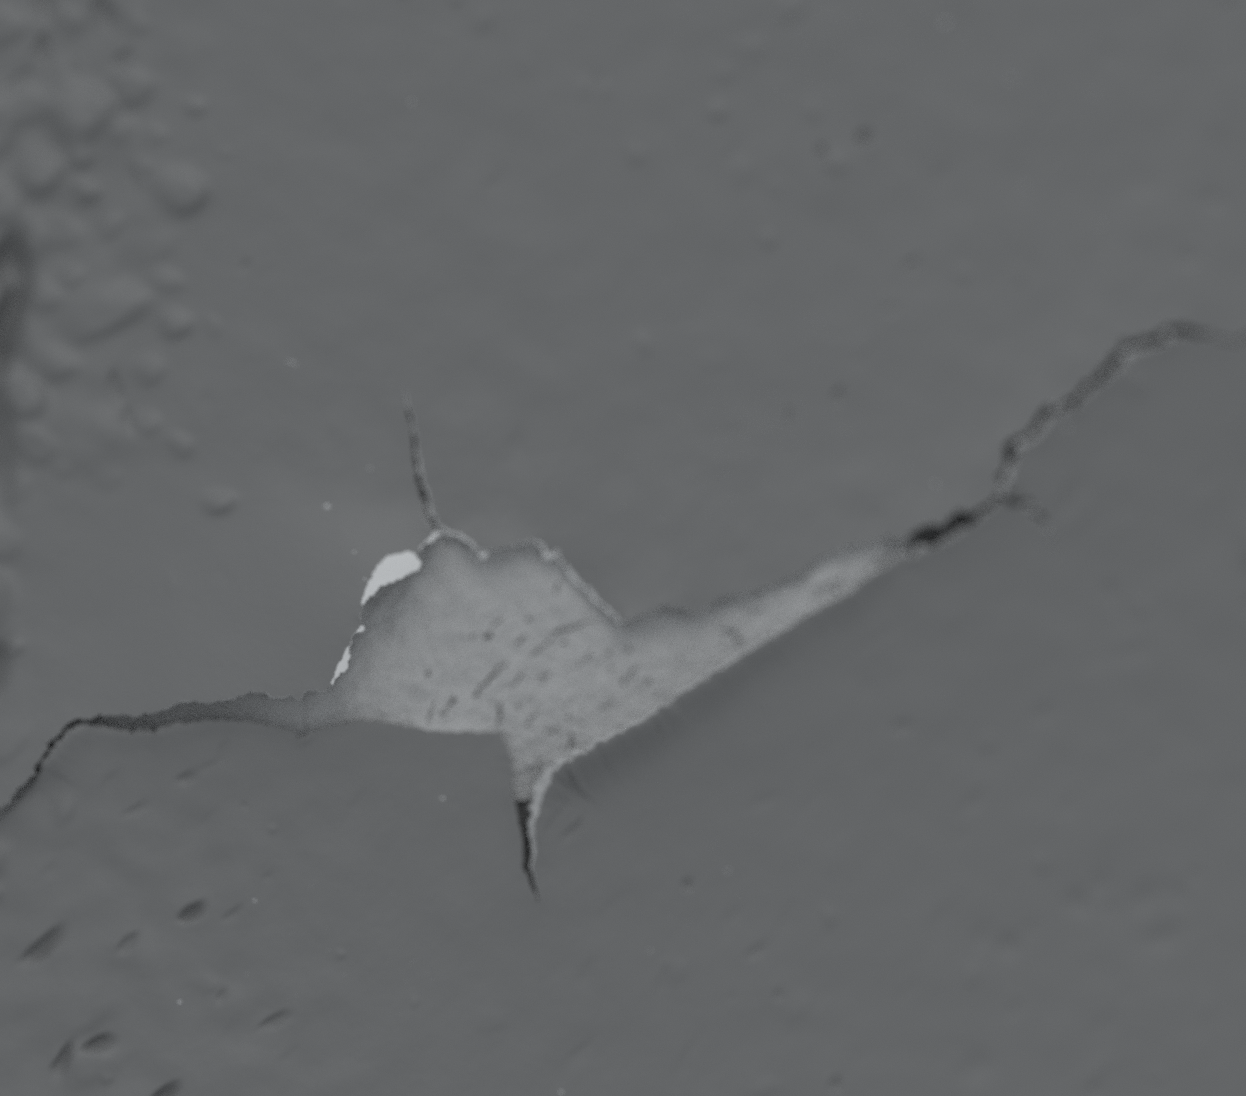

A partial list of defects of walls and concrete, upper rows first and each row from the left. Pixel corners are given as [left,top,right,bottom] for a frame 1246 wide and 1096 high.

crack [404,395,429,500]
crack [911,325,1191,555]
crack [0,691,307,817]
crack [428,620,595,724]
peeling [296,500,911,900]